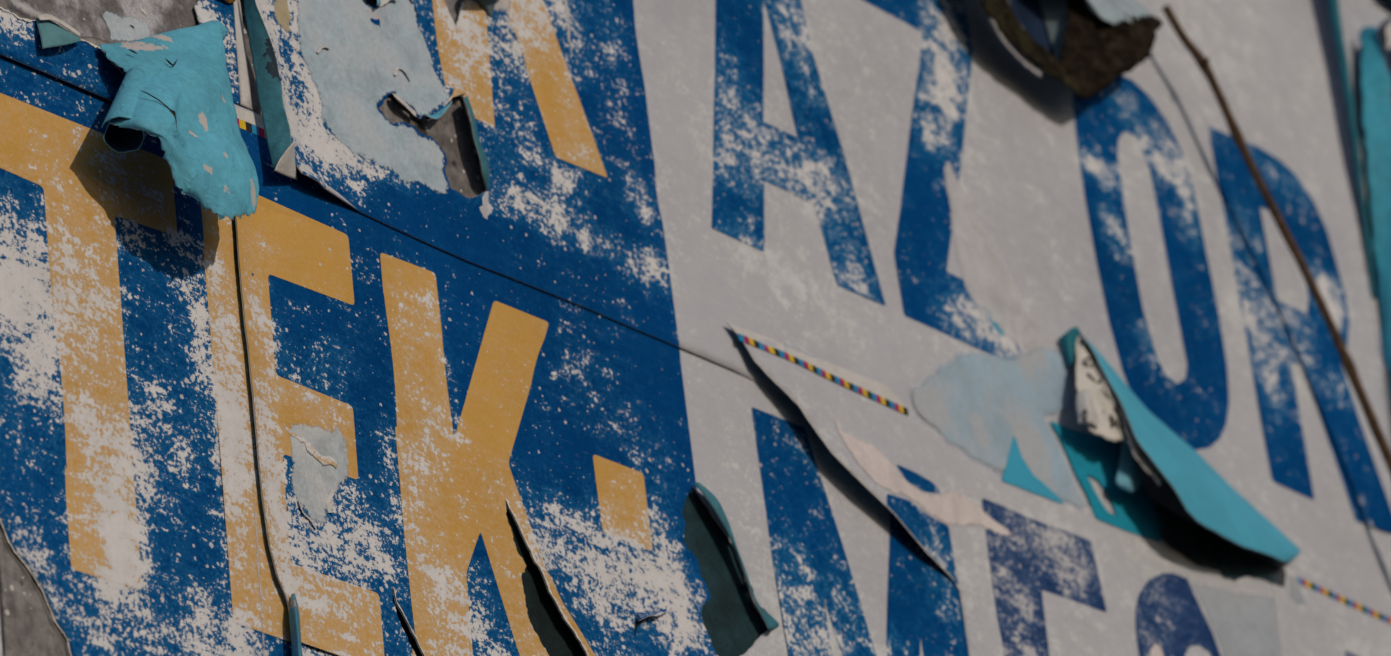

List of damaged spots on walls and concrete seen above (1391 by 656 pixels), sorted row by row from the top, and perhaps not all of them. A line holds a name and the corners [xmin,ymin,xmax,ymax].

peeling [35,13,82,49]
peeling [98,20,259,220]
peeling [275,0,449,194]
peeling [981,0,1163,100]
peeling [283,422,349,529]
peeling [727,322,1012,580]
peeling [912,162,1305,656]